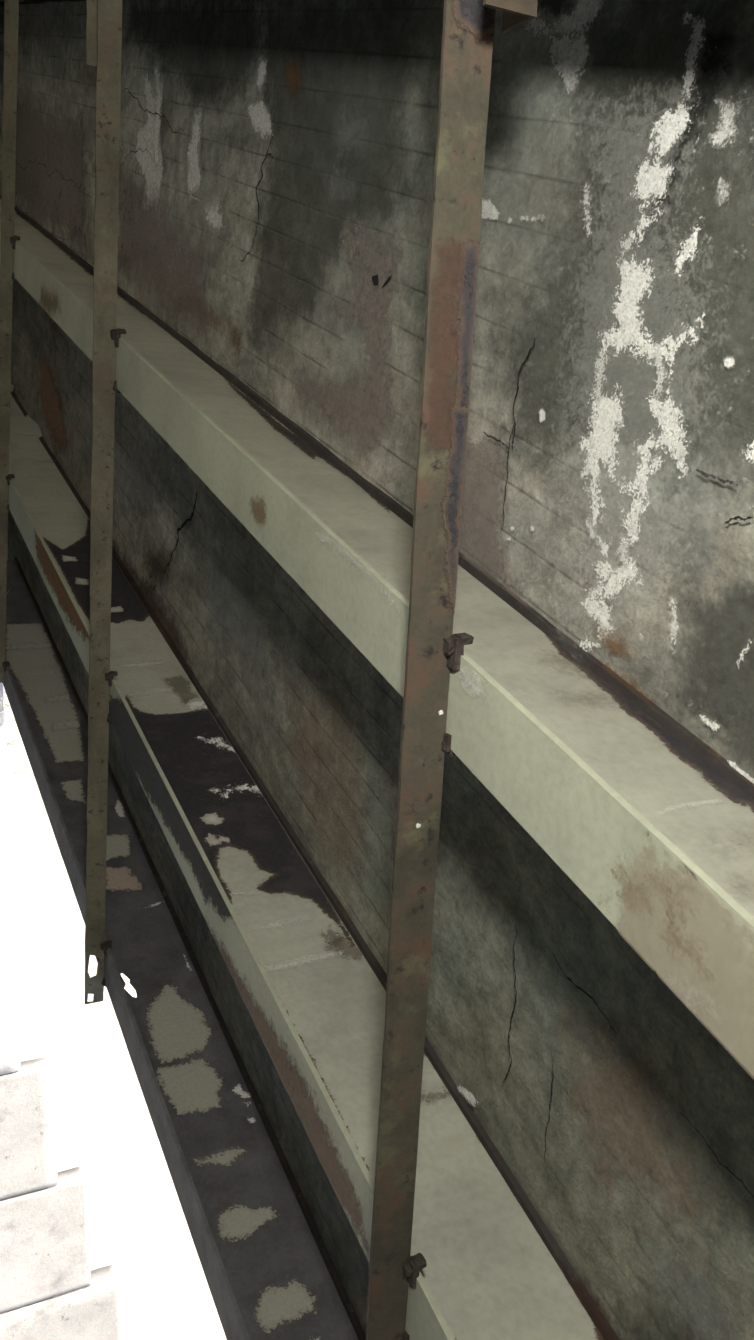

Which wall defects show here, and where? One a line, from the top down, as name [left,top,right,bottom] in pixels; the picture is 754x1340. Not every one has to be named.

water stain [129,0,273,211]
water stain [206,204,223,235]
water stain [579,12,737,652]
peeling [61,555,90,585]
crack [163,492,197,574]
peeling [109,695,235,921]
peeling [210,783,261,798]
crack [502,930,517,1083]
crack [553,954,617,1034]
crack [544,1055,554,1160]